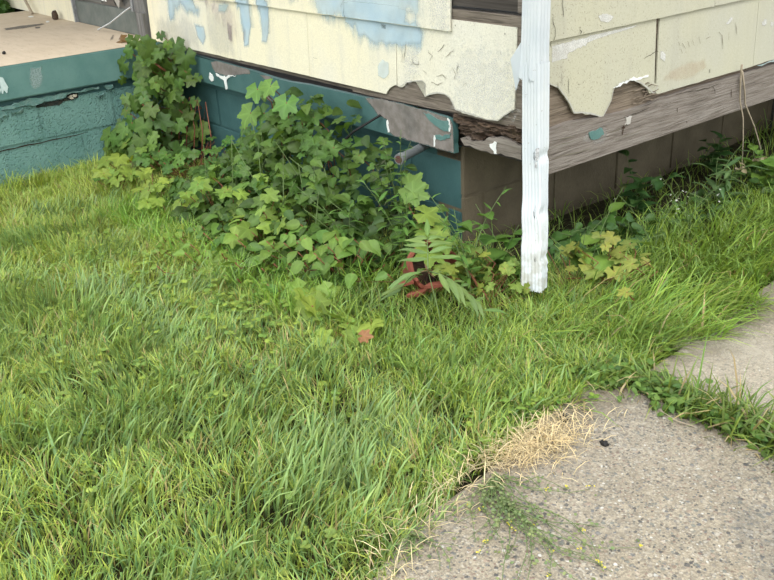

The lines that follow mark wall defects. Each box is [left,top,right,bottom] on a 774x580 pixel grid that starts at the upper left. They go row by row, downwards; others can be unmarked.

peeling [552,14,635,62]
spalling [0,84,114,118]
spalling [397,80,512,121]
spalling [550,75,658,117]
peeling [366,98,454,152]